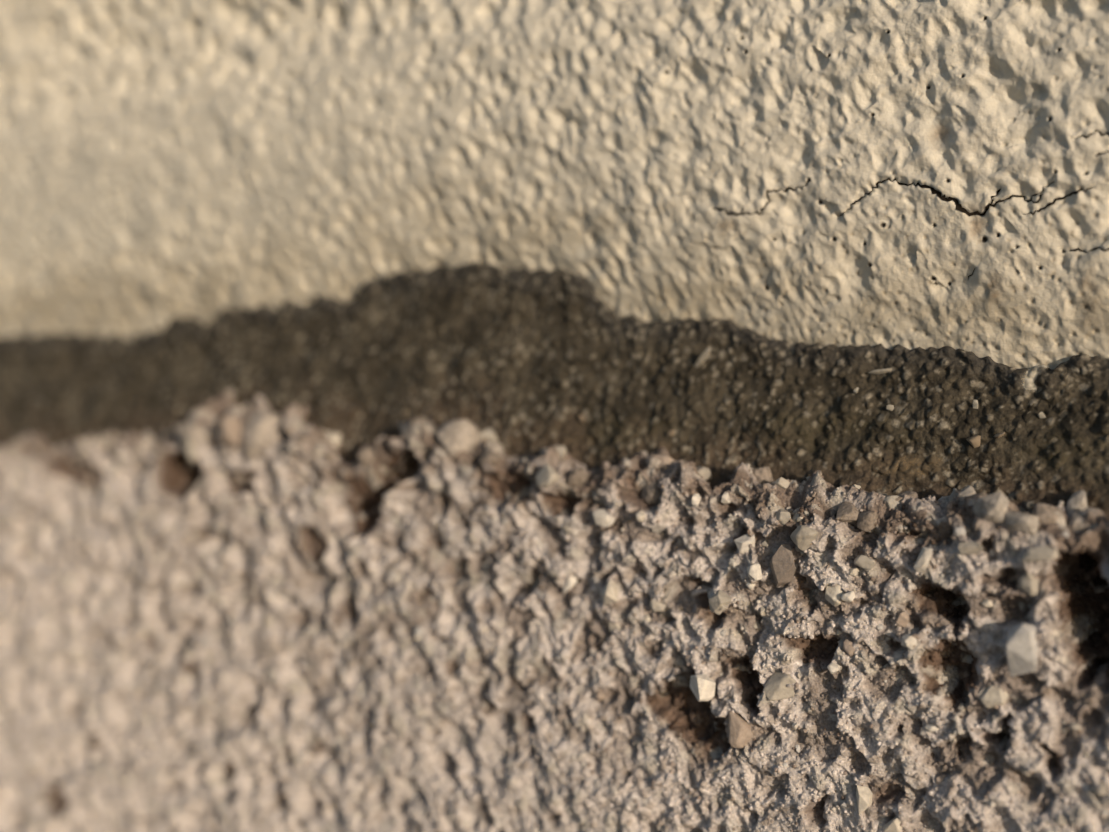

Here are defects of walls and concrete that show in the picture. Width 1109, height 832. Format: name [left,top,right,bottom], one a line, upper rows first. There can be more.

crack [837,178,1093,217]
peeling [694,347,711,367]
flaking render [320,430,341,447]
flaking render [479,428,498,442]
spalling [35,450,104,490]
spalling [148,436,205,504]
spalling [343,443,424,541]
spalling [482,446,675,527]
flaking render [697,466,712,481]
flaking render [771,477,790,489]
spalling [293,522,332,570]
spalling [350,557,373,582]